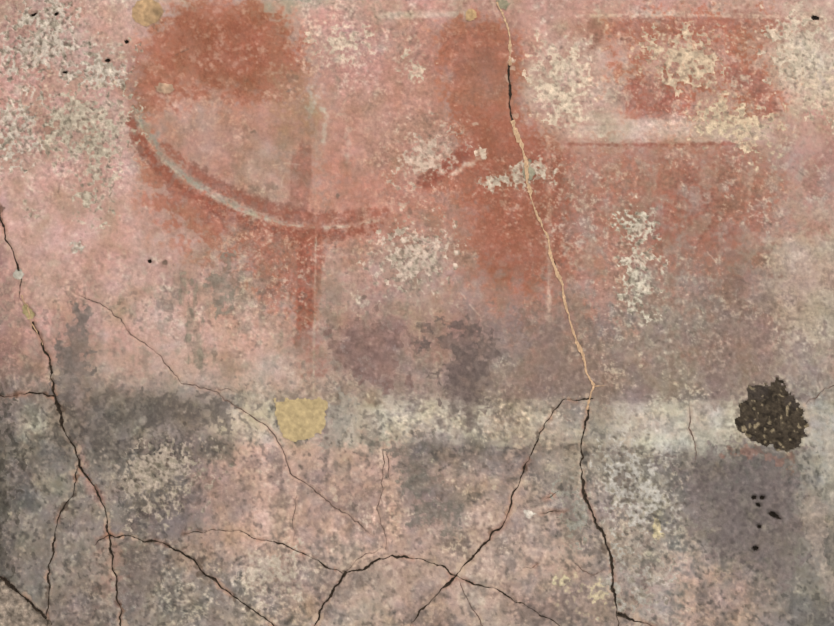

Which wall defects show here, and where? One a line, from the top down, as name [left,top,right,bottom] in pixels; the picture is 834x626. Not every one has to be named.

crack [506,65,514,121]
crack [0,216,652,626]
spalling [735,377,809,452]